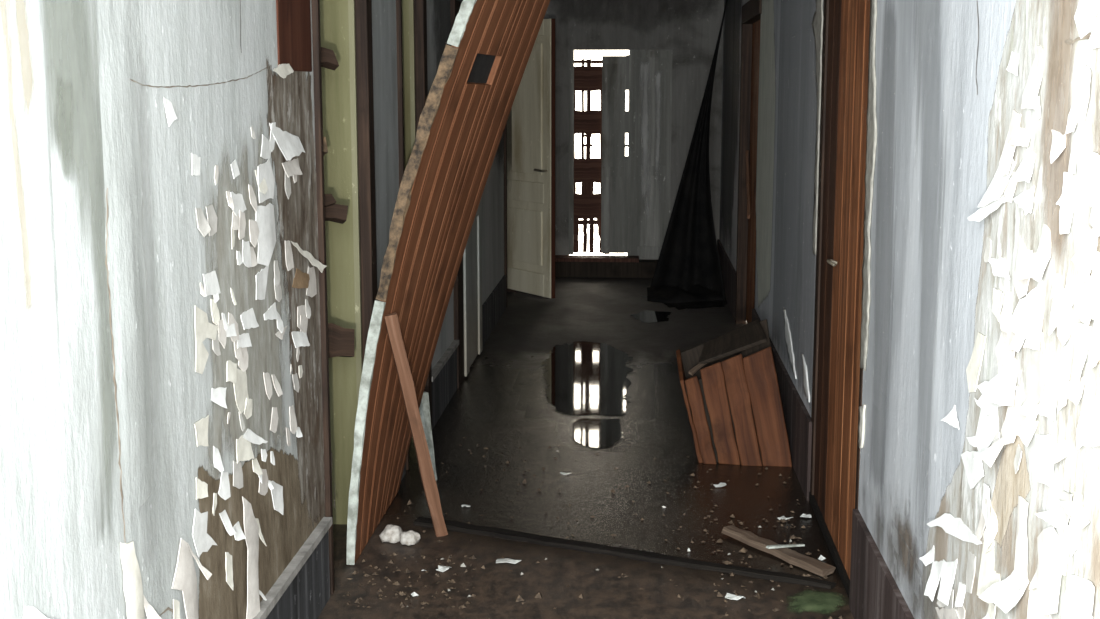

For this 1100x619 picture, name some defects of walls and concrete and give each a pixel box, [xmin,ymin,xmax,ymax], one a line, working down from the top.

flaking render [120,59,335,619]
flaking render [898,0,1100,619]